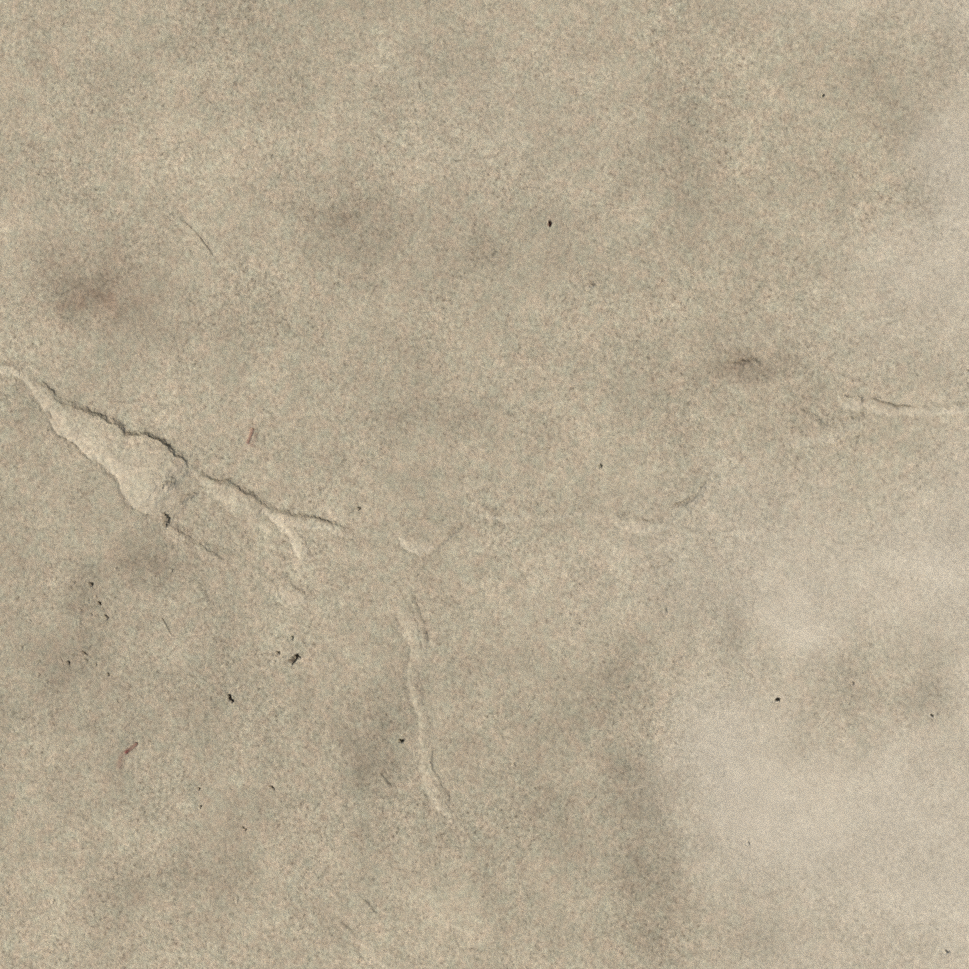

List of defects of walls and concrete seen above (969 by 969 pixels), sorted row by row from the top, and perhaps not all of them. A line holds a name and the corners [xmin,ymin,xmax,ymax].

crack [195,459,361,566]